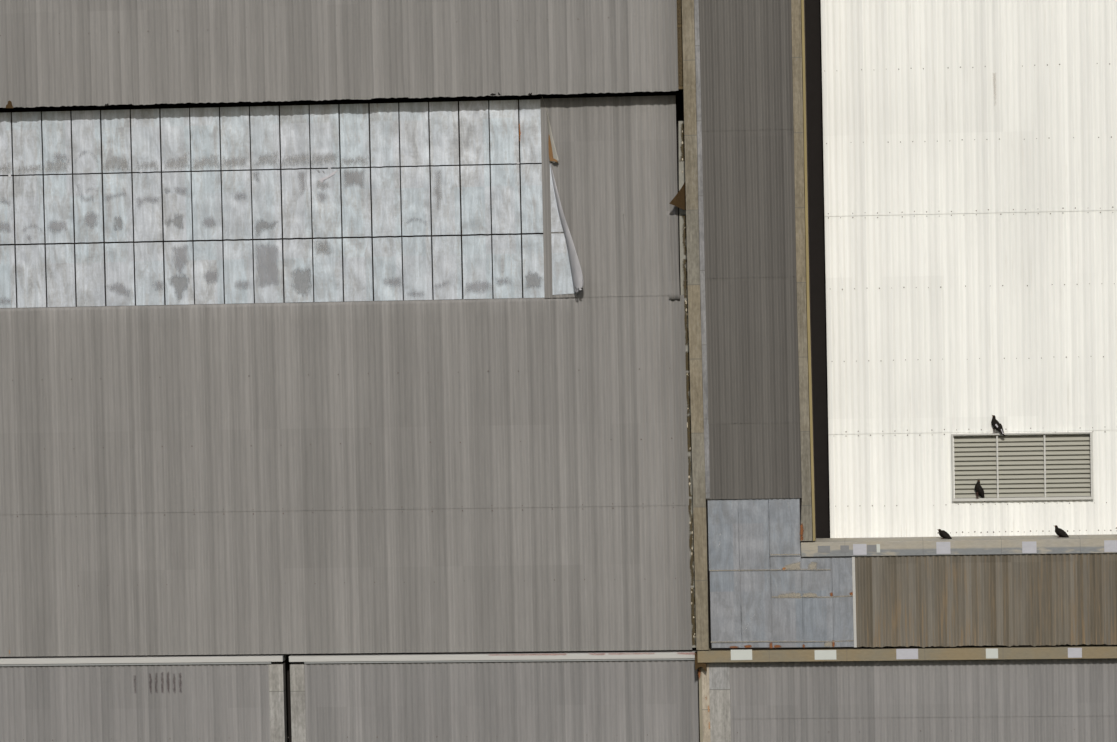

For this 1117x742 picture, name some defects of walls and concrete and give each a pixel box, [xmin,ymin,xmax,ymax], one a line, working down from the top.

peeling [542,97,583,295]